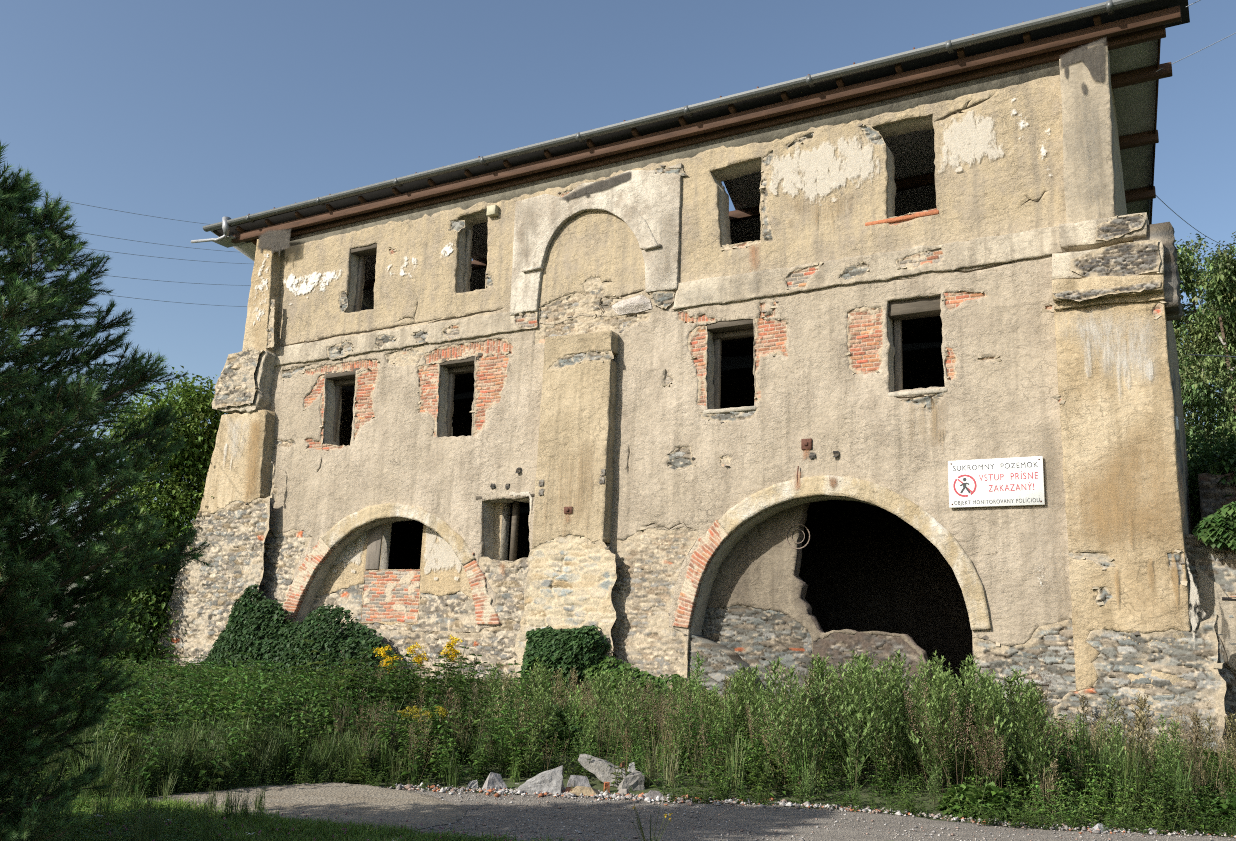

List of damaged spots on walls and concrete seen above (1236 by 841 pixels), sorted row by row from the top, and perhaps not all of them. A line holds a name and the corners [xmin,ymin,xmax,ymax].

peeling [721,123,884,251]
spalling [213,254,276,410]
peeling [284,269,348,313]
flaking render [271,325,513,464]
spalling [515,262,823,423]
flaking render [845,307,884,374]
spalling [901,347,958,413]
spalling [1041,213,1167,319]
spalling [668,446,696,470]
crack [1216,635,1236,674]